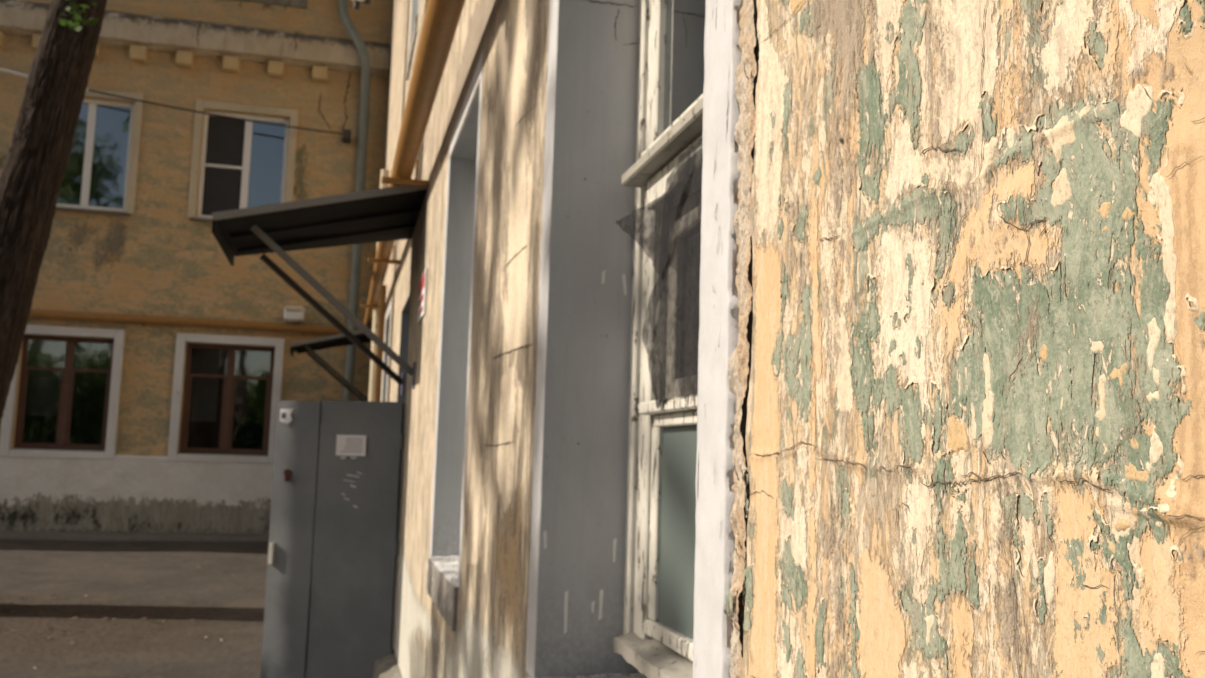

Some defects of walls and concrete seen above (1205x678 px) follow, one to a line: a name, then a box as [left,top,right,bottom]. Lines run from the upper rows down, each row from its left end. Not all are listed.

peeling [465,0,538,568]
crack [589,0,638,45]
crack [743,0,801,189]
flaking render [725,0,830,678]
crack [714,236,1029,678]
peeling [772,0,1205,678]
crack [1058,478,1107,490]
crack [1167,514,1203,550]